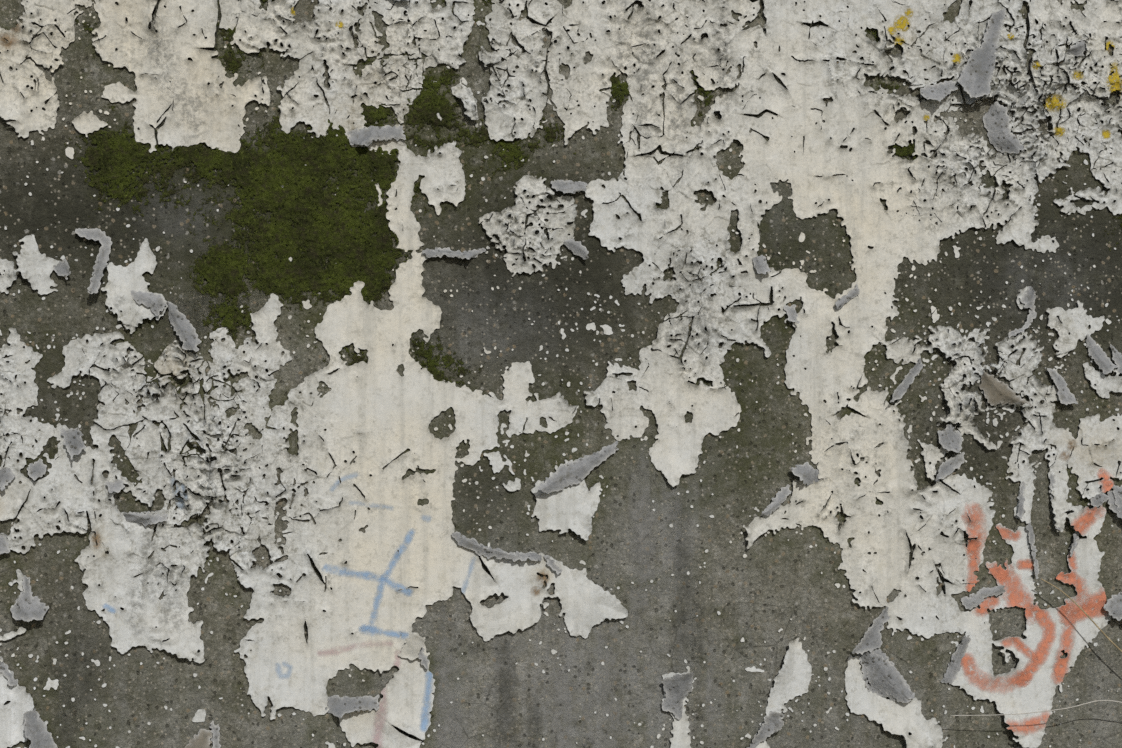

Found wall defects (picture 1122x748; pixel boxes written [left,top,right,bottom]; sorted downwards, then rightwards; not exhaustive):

crack [151,0,159,22]
crack [204,0,222,51]
crack [741,0,765,34]
crack [803,20,827,28]
crack [634,124,682,156]
crack [743,110,777,118]
peeling [0,0,361,503]
peeling [211,0,1029,748]
peeling [836,147,1122,675]
peeling [106,422,168,526]
peeling [0,491,399,748]
peeling [1037,467,1122,748]